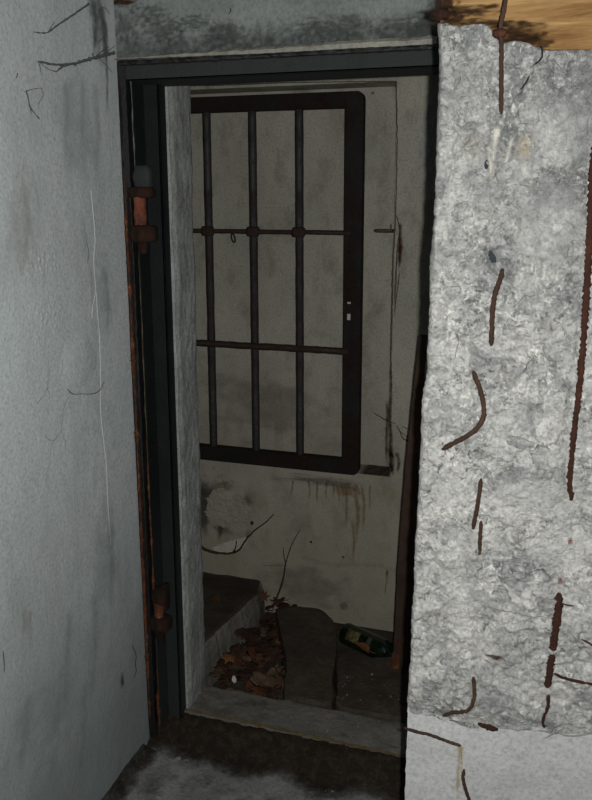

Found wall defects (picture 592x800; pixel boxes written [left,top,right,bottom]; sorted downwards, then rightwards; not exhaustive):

spalling [407,0,592,734]
spalling [404,727,461,747]